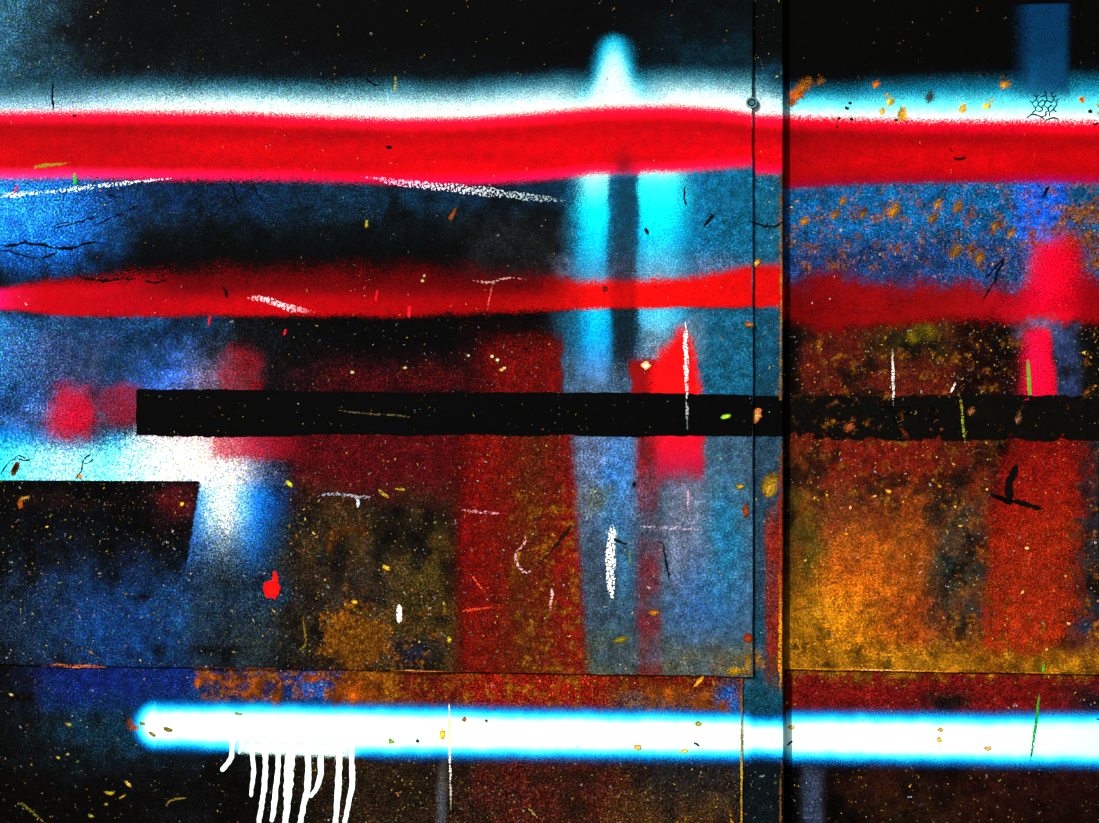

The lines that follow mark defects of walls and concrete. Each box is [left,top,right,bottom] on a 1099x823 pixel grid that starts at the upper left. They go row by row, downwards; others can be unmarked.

crack [1027,91,1059,121]
corrosion [830,195,847,219]
corrosion [886,200,901,221]
corrosion [926,200,964,224]
crack [0,193,166,284]
corrosion [946,244,988,264]
corrosion [193,667,284,706]
corrosion [303,668,451,707]